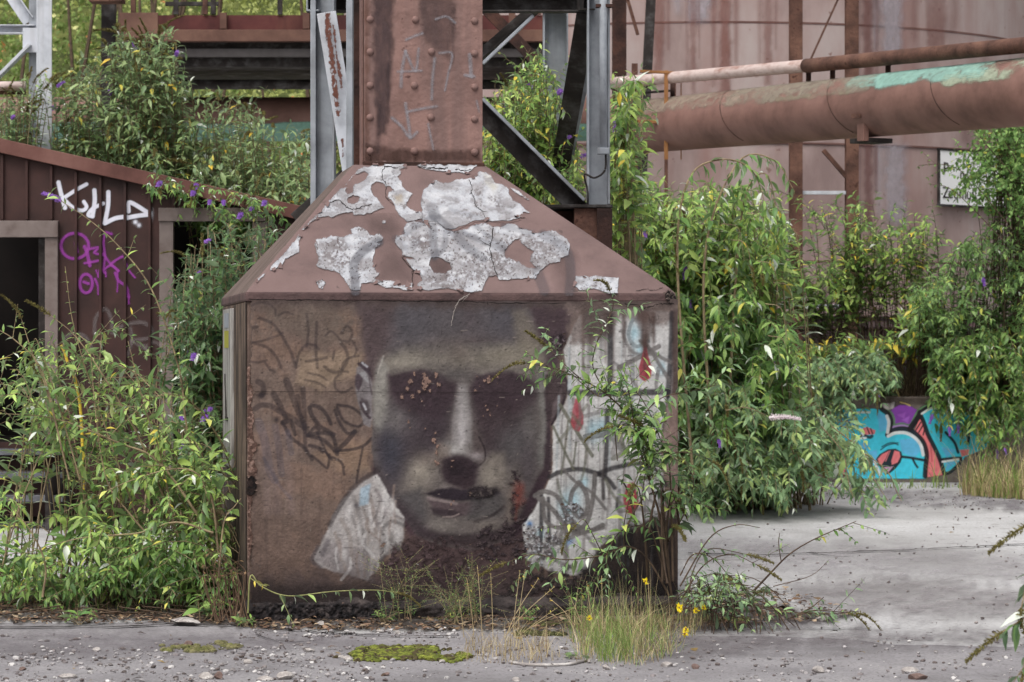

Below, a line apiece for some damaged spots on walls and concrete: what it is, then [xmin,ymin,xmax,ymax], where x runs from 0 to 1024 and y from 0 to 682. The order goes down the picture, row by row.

rust [374,0,393,133]
rust [366,145,479,162]
peeling [255,161,570,292]
peeling [573,275,619,293]